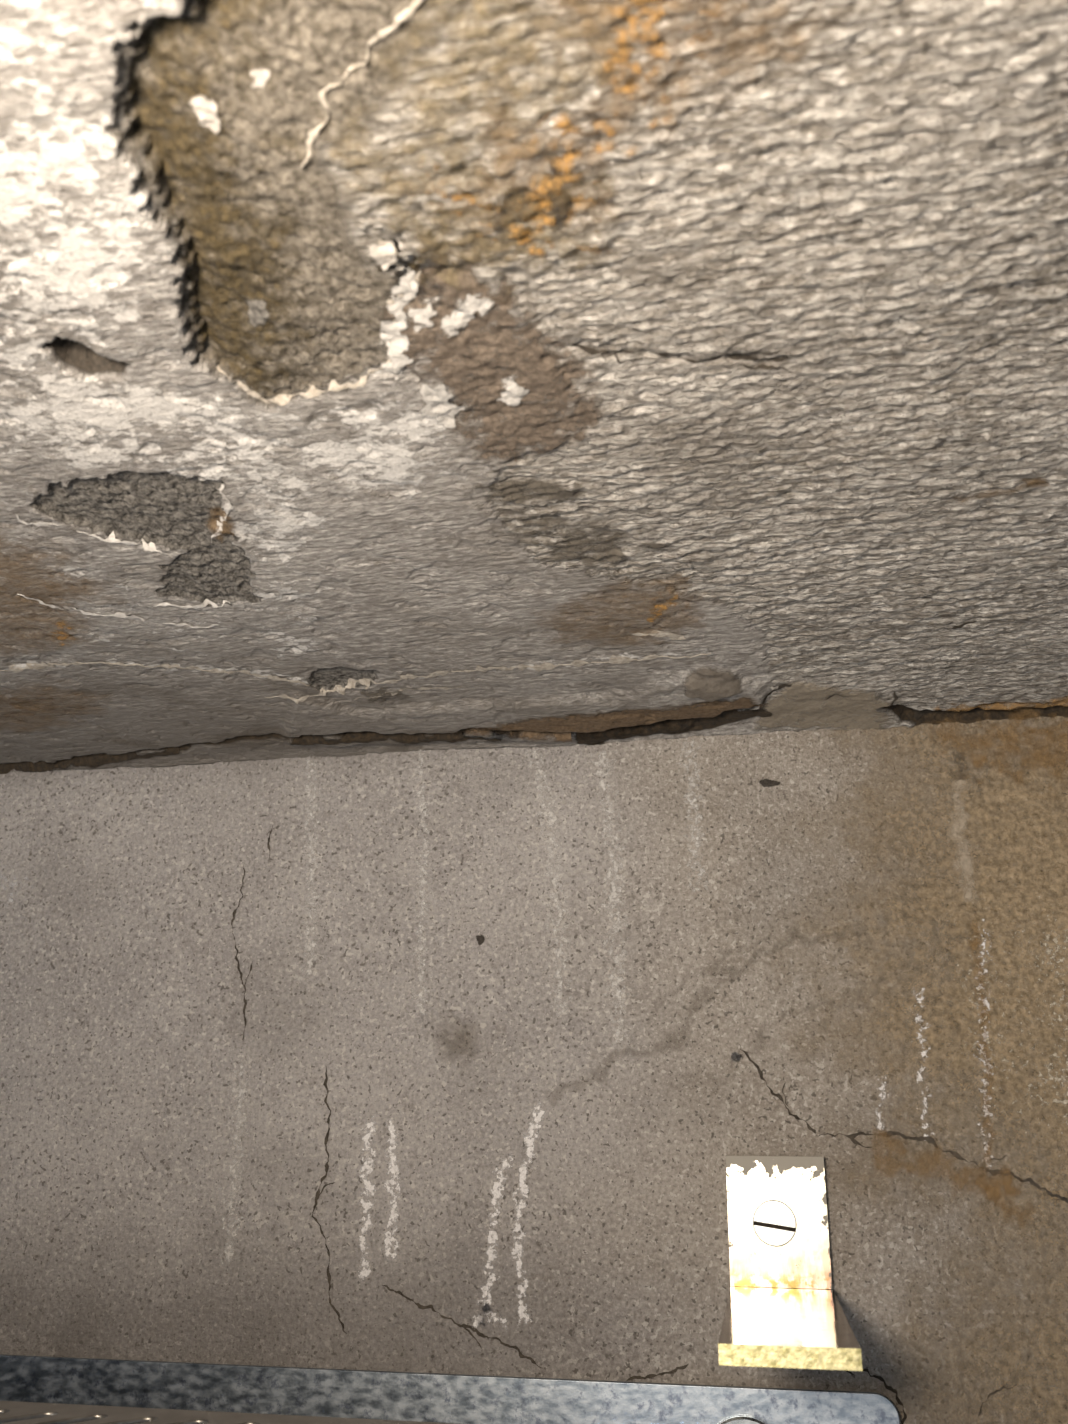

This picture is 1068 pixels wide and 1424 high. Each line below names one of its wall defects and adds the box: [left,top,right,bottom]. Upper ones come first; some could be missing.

corrosion [514,153,595,254]
spalling [0,0,713,704]
crack [0,684,792,774]
crack [881,692,1068,726]
crack [231,826,273,1041]
crack [739,1044,1068,1203]
crack [312,1066,347,1334]
crack [382,1285,541,1368]
crack [627,1364,688,1381]
crack [844,1369,907,1424]
crack [978,1384,1017,1417]